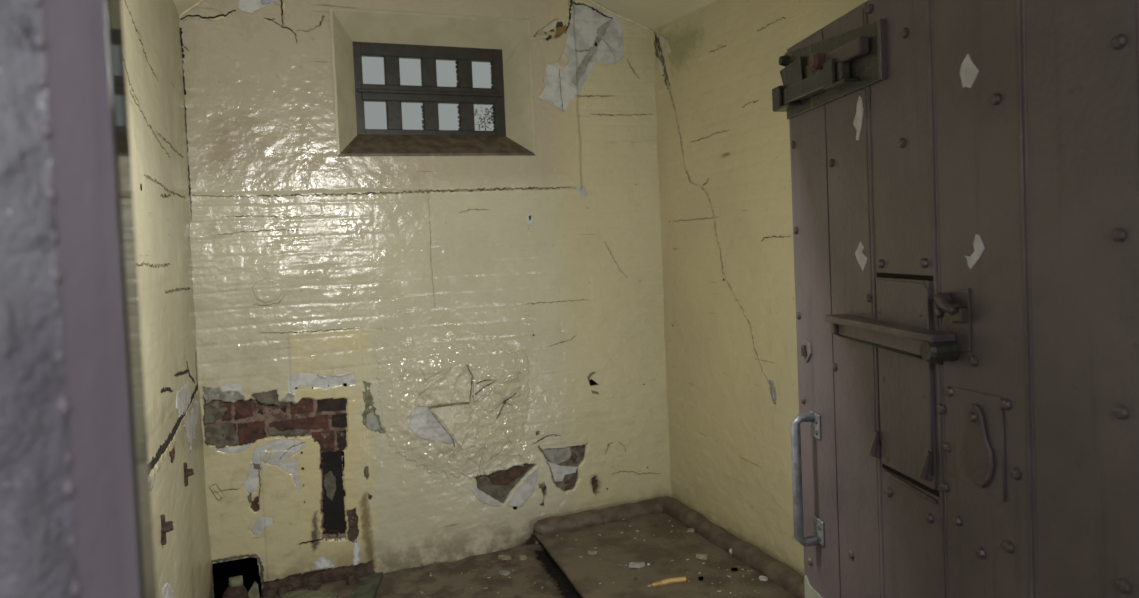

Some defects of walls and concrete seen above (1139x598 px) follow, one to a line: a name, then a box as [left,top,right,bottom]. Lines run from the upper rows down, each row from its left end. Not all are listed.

peeling [238,0,280,13]
peeling [534,2,624,113]
crack [563,0,613,34]
crack [125,0,575,304]
crack [575,45,777,404]
crack [149,363,199,491]
flaking render [203,368,359,545]
flaking render [471,441,587,510]